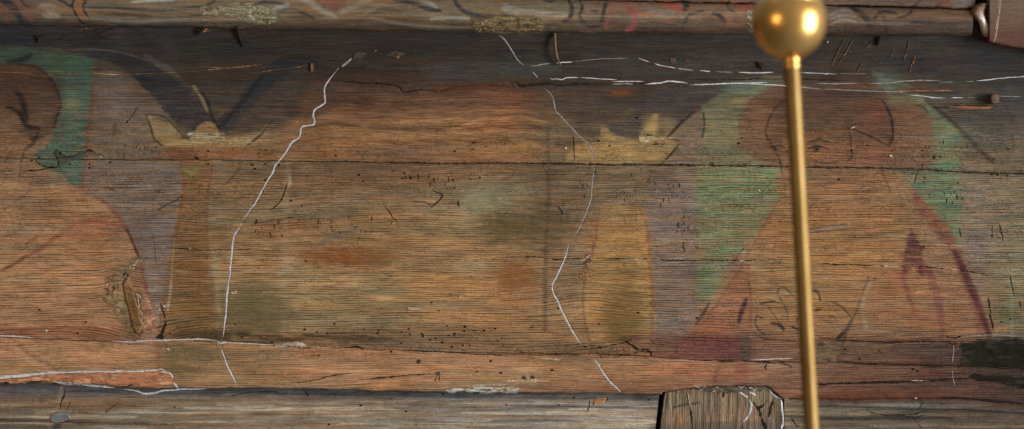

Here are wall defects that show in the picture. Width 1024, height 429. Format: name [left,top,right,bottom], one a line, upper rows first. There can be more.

crack [5,65,306,76]
crack [1,159,53,173]
crack [75,35,1024,397]
crack [701,263,1021,429]